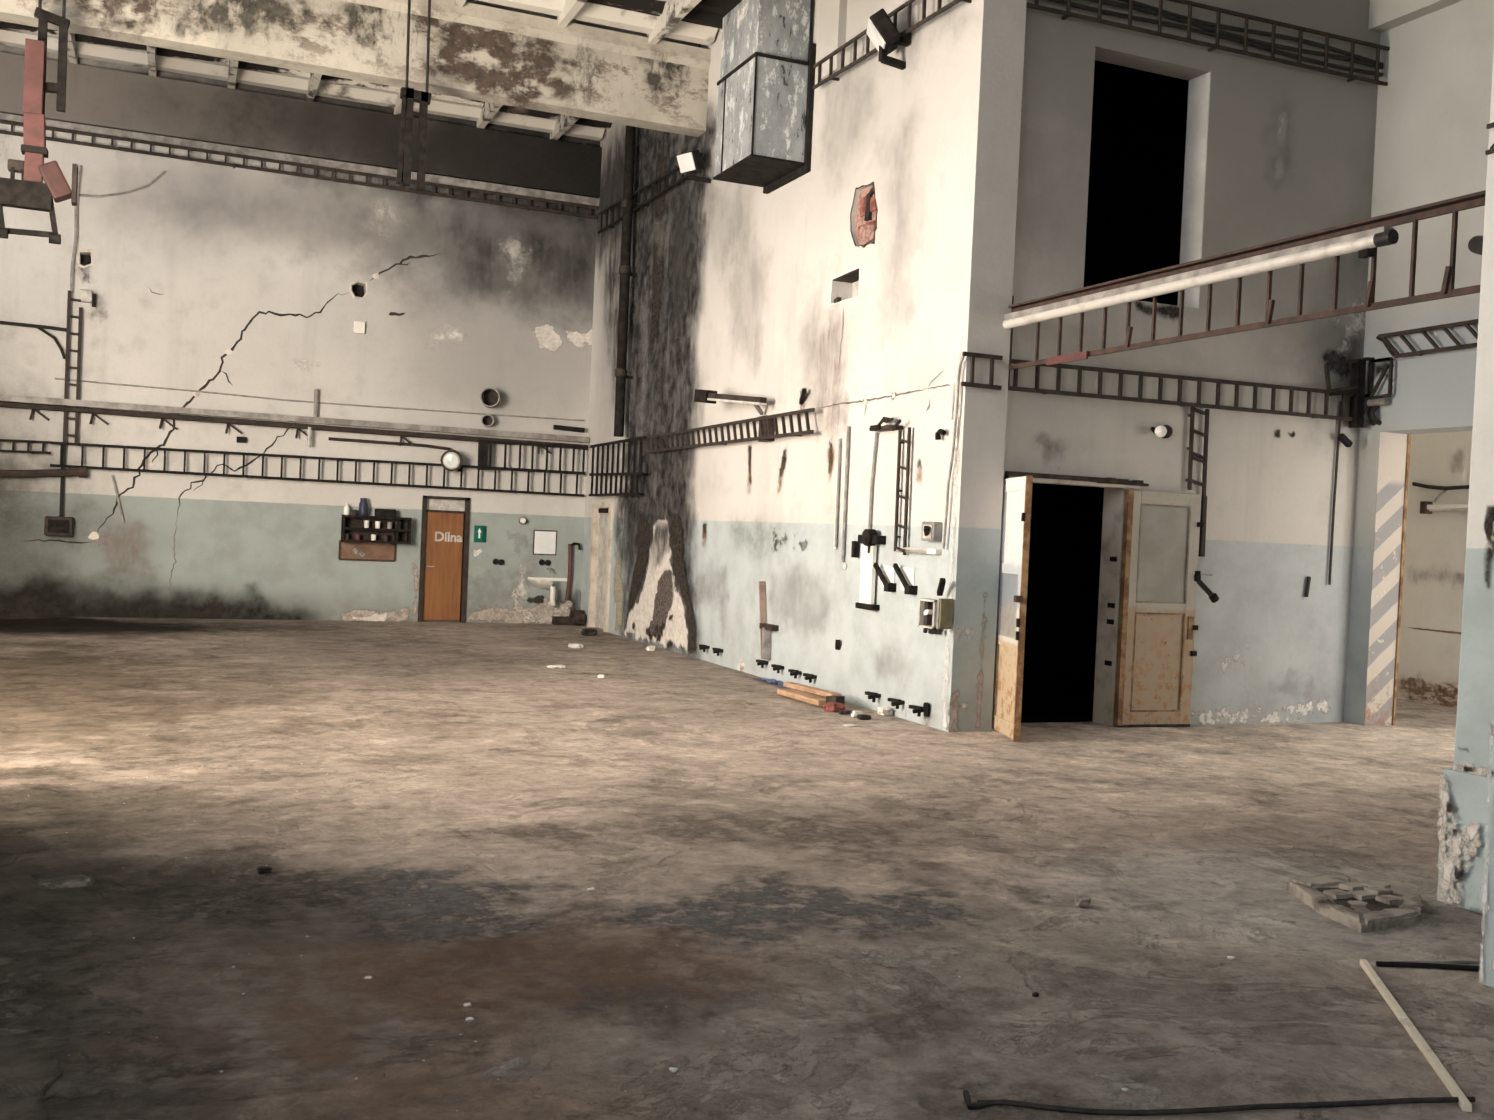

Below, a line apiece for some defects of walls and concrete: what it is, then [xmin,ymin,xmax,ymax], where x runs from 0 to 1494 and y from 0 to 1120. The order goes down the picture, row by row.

leakage [57,0,154,32]
mould [176,0,383,45]
leakage [414,14,575,113]
leakage [638,56,685,91]
spalling [850,181,878,248]
crack [29,254,438,544]
crack [169,428,290,592]
leakage [614,513,650,631]
flaking render [624,520,688,651]
flaking render [1484,506,1494,554]
flaking render [1436,749,1494,982]